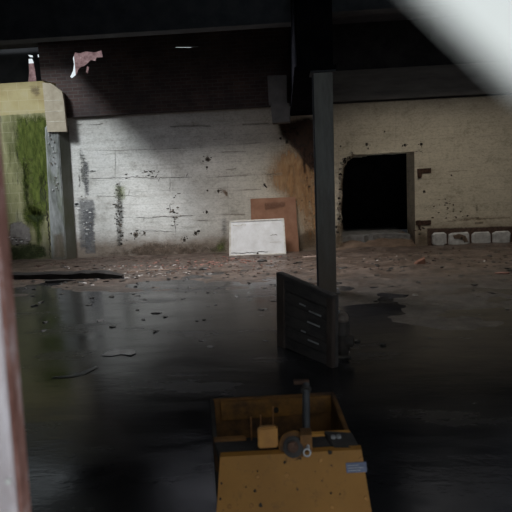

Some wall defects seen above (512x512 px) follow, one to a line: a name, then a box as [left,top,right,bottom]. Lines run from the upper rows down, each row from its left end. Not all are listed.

damp [23,118,51,203]
damp [79,150,95,253]
mould [116,184,124,246]
rust [272,149,316,241]